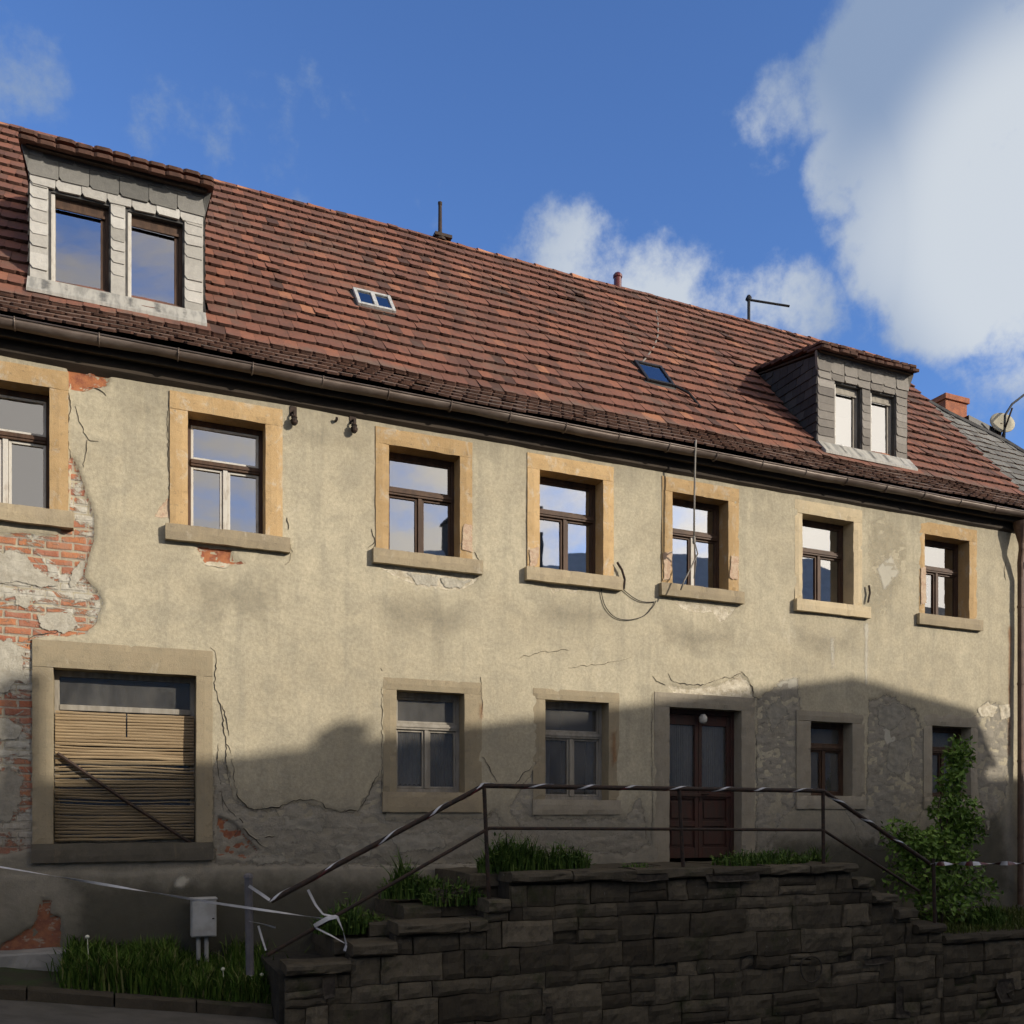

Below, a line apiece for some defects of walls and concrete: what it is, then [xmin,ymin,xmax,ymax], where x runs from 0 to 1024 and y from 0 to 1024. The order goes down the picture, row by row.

crack [68,387,106,466]
spalling [68,371,109,391]
spalling [198,547,244,568]
peeling [878,557,898,589]
spalling [0,458,103,855]
crack [211,648,383,848]
spalling [212,761,648,867]
crack [651,672,758,780]
spalling [669,675,801,853]
spalling [845,695,923,846]
spalling [974,702,1011,830]
spalling [0,900,61,950]